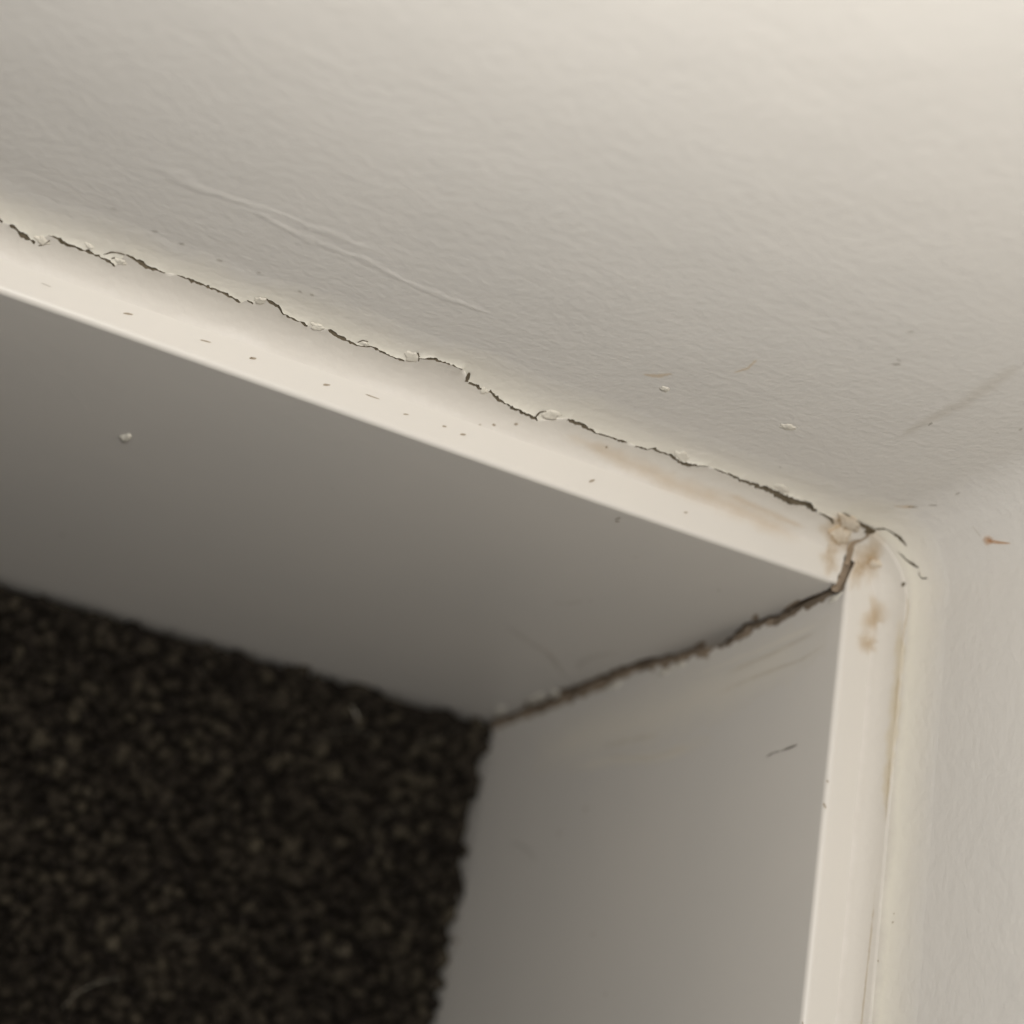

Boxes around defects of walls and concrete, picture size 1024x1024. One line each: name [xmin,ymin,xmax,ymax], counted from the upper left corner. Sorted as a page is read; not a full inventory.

crack [0,219,928,731]